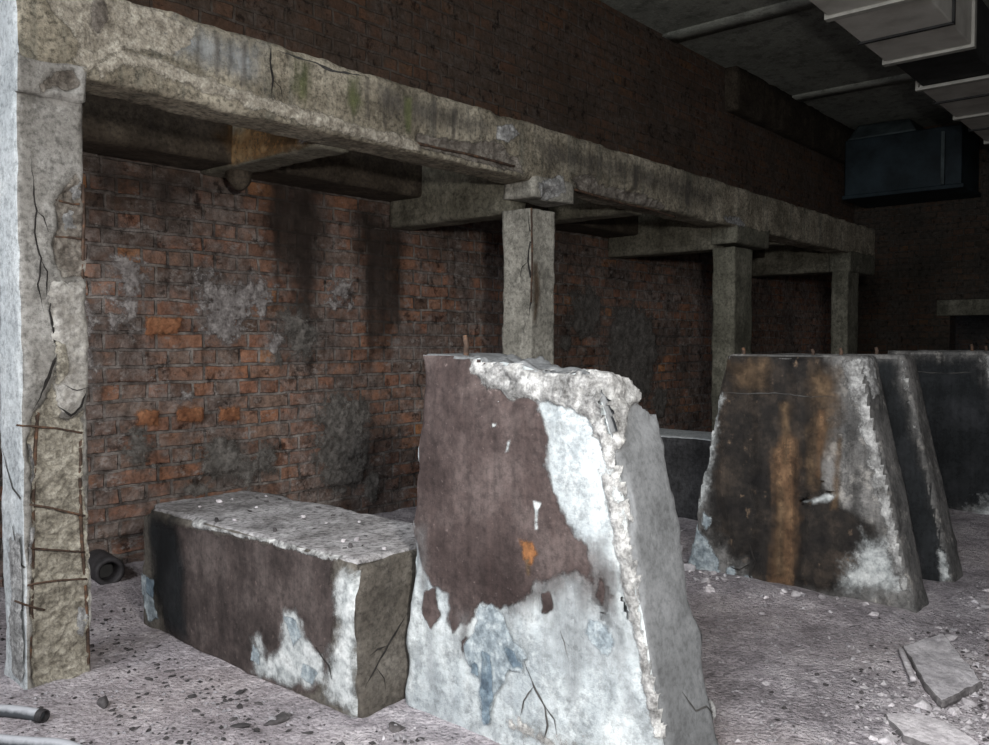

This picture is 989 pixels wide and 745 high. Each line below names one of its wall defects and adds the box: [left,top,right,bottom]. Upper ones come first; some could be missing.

crack [31,171,49,307]
spalling [8,174,184,687]
peeling [141,518,360,715]
flaking render [308,389,380,503]
crack [521,661,557,743]
peeling [414,355,667,745]
damp [716,370,759,557]
corrosion [770,405,796,585]
damp [790,357,901,591]